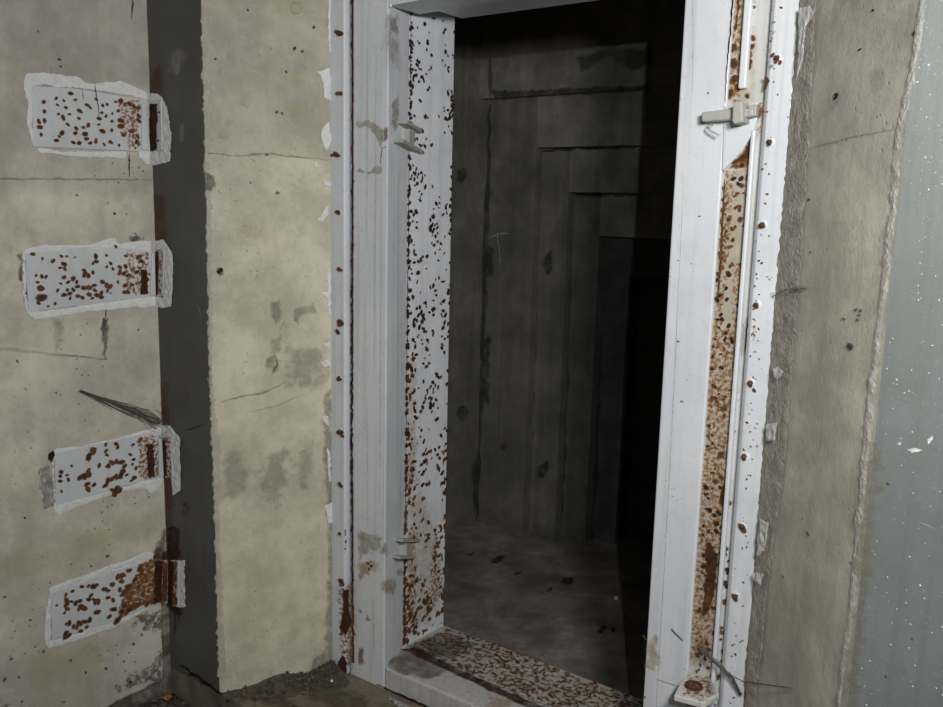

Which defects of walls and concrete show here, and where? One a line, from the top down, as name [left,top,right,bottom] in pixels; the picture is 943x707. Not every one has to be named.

corrosion [725,0,756,102]
corrosion [764,6,783,90]
corrosion [37,91,160,152]
corrosion [30,245,163,307]
corrosion [383,12,643,707]
corrosion [657,103,772,707]
corrosion [58,435,172,510]
corrosion [55,527,182,640]